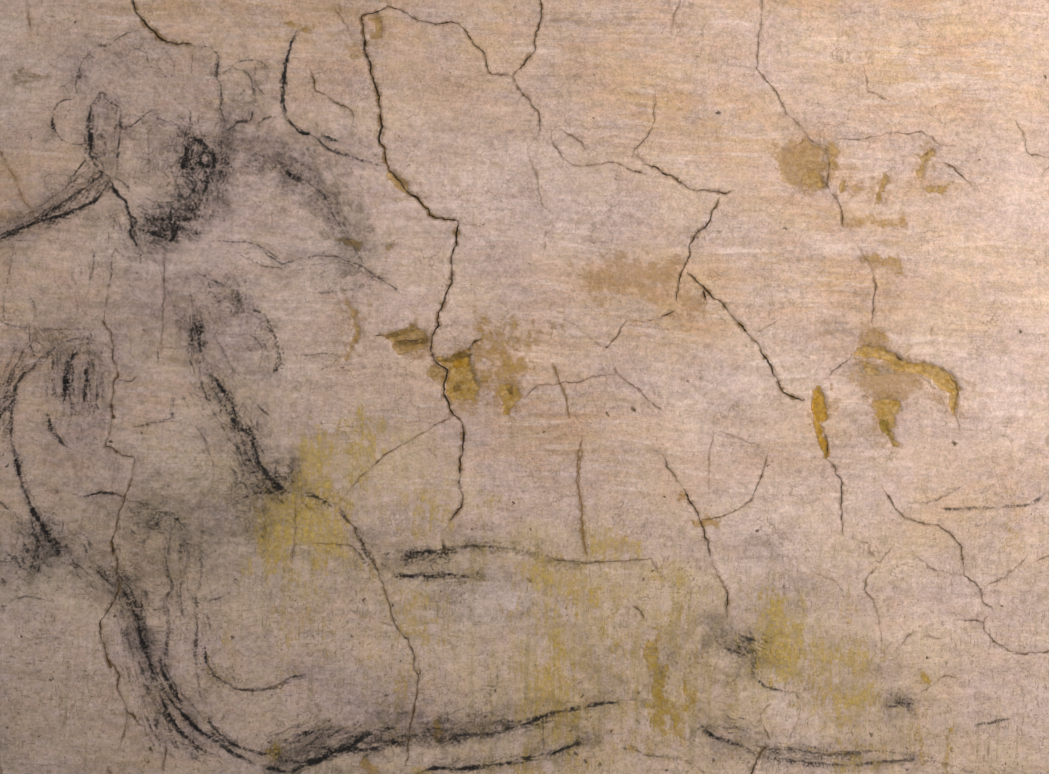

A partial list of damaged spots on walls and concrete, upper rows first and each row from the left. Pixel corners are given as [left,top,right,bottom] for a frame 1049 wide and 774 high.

crack [132,0,192,46]
crack [311,0,543,520]
crack [611,108,802,401]
spalling [385,324,430,358]
spalling [427,349,480,401]
spalling [497,384,522,415]
spalling [809,385,832,458]
spalling [873,391,901,447]
spalling [854,330,961,413]
crack [99,320,141,734]
crack [666,459,767,553]
crack [885,491,1048,655]